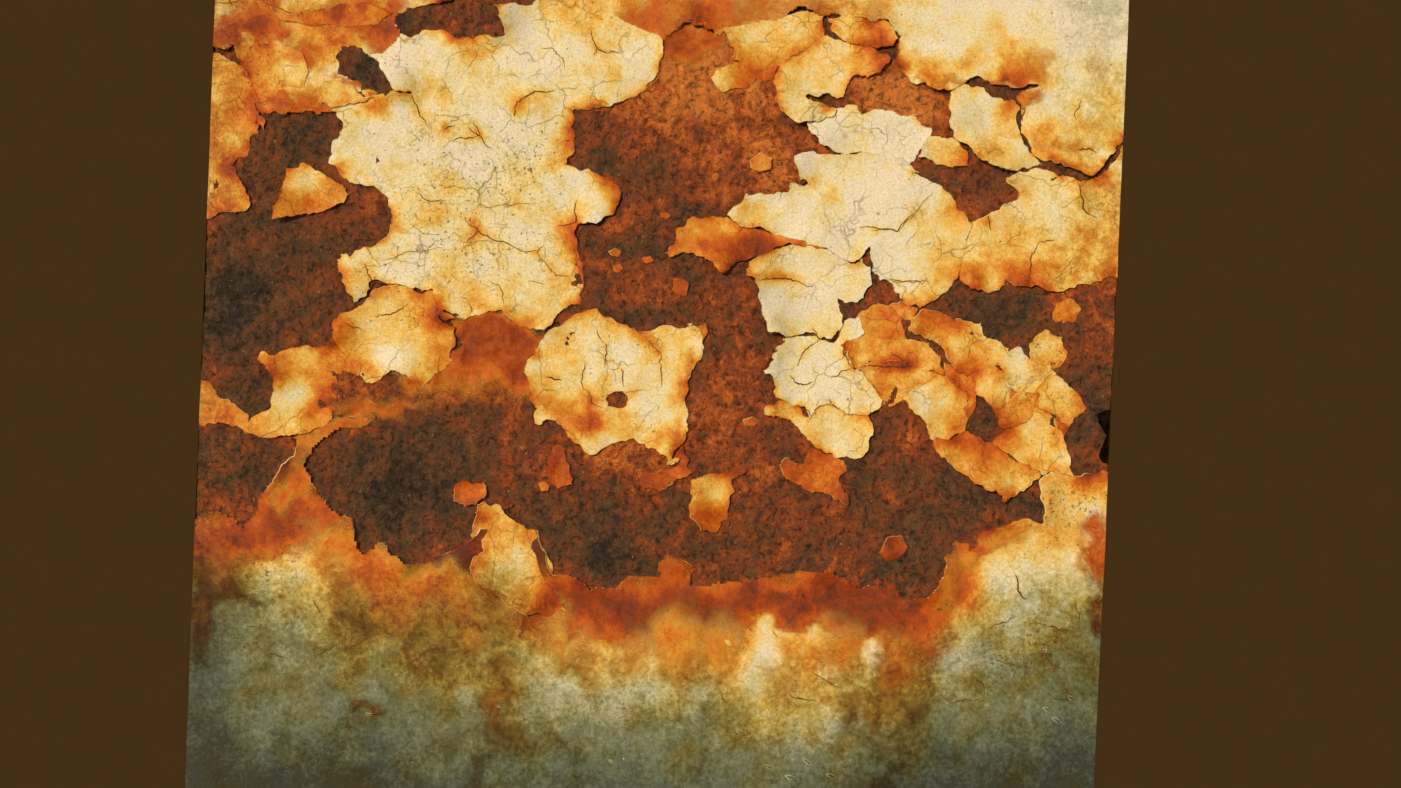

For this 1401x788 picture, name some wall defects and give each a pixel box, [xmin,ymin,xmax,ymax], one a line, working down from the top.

crack [344,95,577,330]
peeling [199,0,746,533]
crack [514,31,619,115]
peeling [665,10,1123,505]
crack [860,194,932,246]
rust [834,59,1122,222]
crack [546,332,624,408]
rust [191,0,1048,750]
rust [838,272,1116,476]
peeling [453,480,566,633]
peeling [880,536,908,561]
rust [1078,513,1106,633]